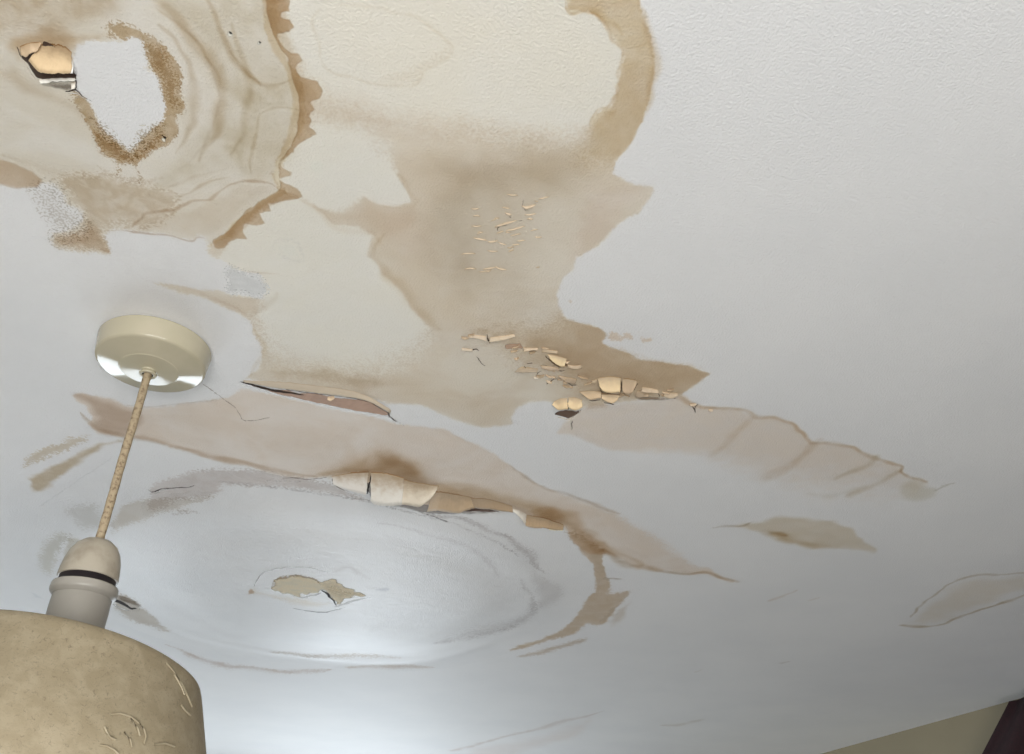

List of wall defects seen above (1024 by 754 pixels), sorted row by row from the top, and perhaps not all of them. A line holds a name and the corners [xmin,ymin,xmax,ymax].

peeling [17,41,91,101]
crack [203,380,400,423]
peeling [461,333,678,427]
peeling [254,569,365,613]